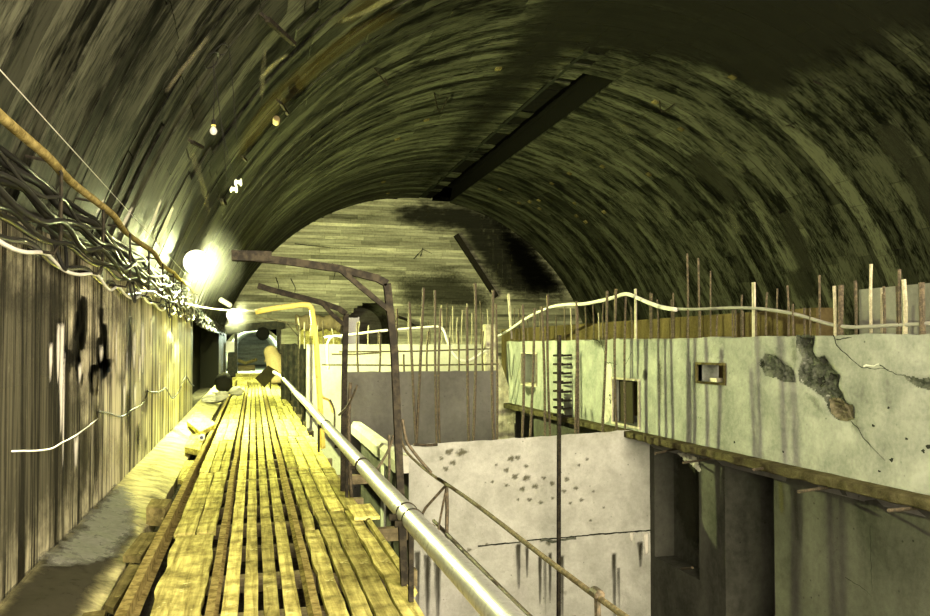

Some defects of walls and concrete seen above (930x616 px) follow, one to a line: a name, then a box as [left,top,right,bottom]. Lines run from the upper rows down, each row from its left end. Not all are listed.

spalling [755,275,858,421]
crack [833,335,906,376]
spalling [903,374,930,390]